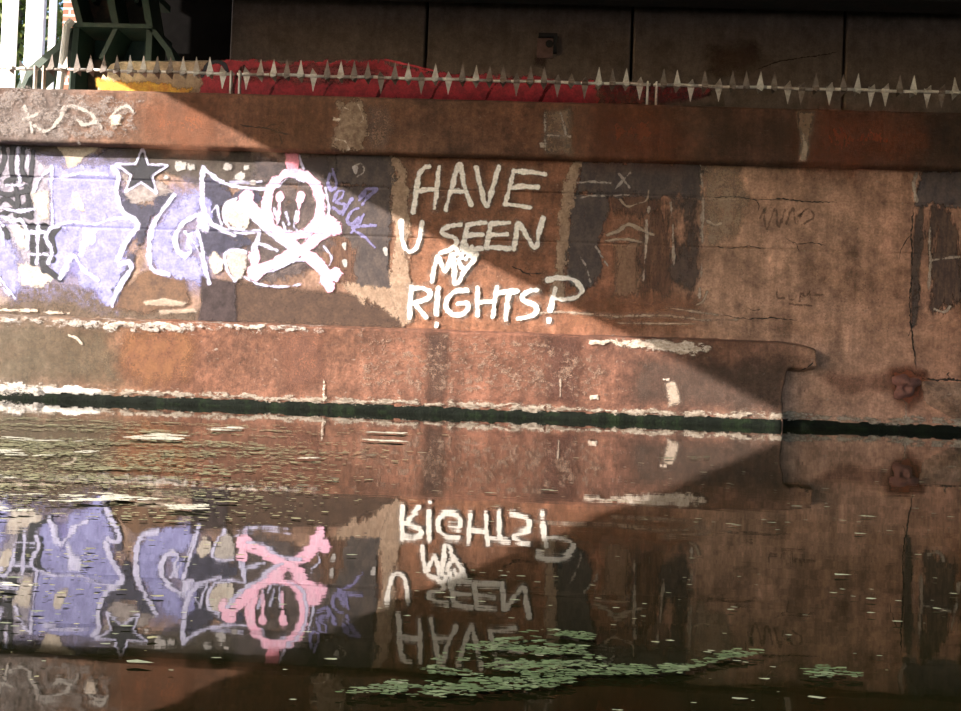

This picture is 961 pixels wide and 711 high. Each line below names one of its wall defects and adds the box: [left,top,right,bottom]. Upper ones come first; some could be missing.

rust [120,330,193,386]
crack [899,212,961,382]